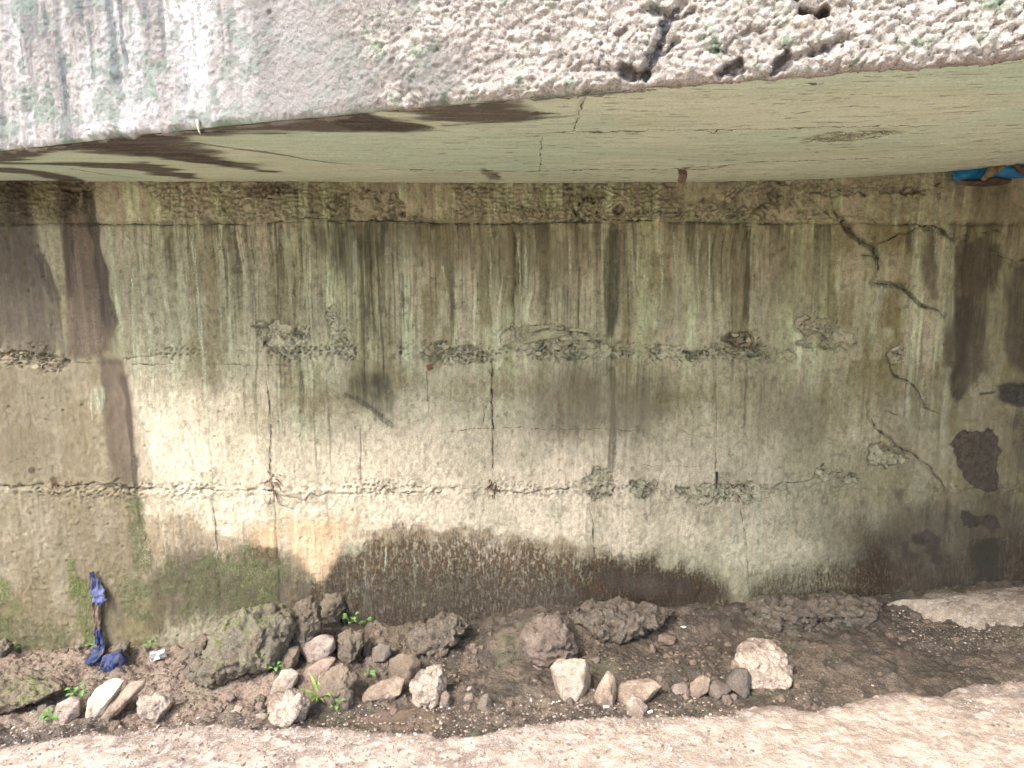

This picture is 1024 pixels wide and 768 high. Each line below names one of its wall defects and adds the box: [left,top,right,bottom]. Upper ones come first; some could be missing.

leakage [0,90,630,482]
spalling [500,322,618,360]
leakage [945,239,999,398]
spalling [675,481,772,505]
crack [872,362,945,488]
peeling [950,428,1002,492]
leakage [311,524,730,627]